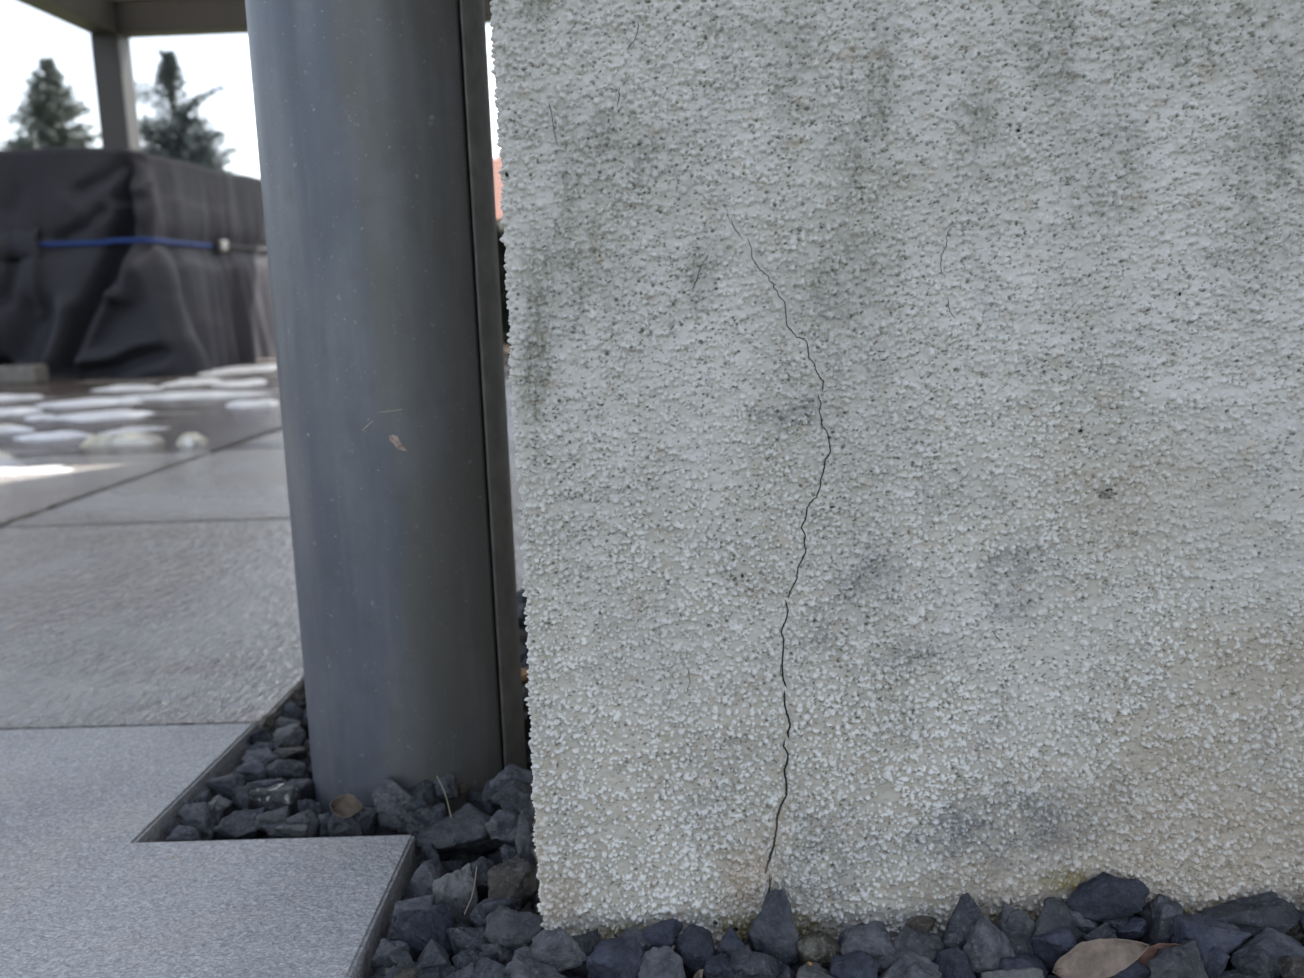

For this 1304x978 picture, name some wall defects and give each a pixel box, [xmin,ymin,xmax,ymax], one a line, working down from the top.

crack [723,205,831,905]